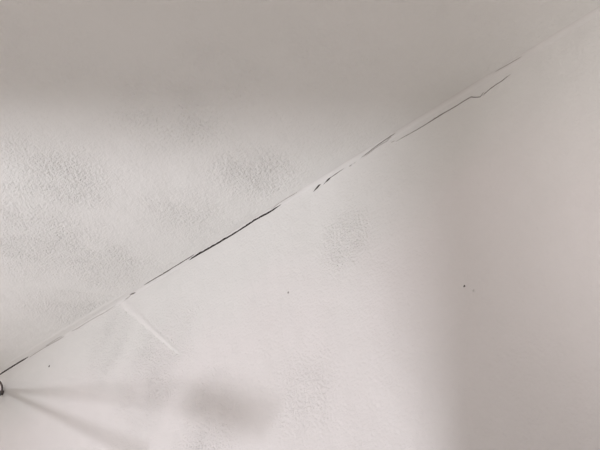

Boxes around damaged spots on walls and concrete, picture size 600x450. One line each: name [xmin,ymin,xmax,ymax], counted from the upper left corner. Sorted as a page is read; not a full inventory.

crack [361,57,521,158]
crack [0,192,297,375]